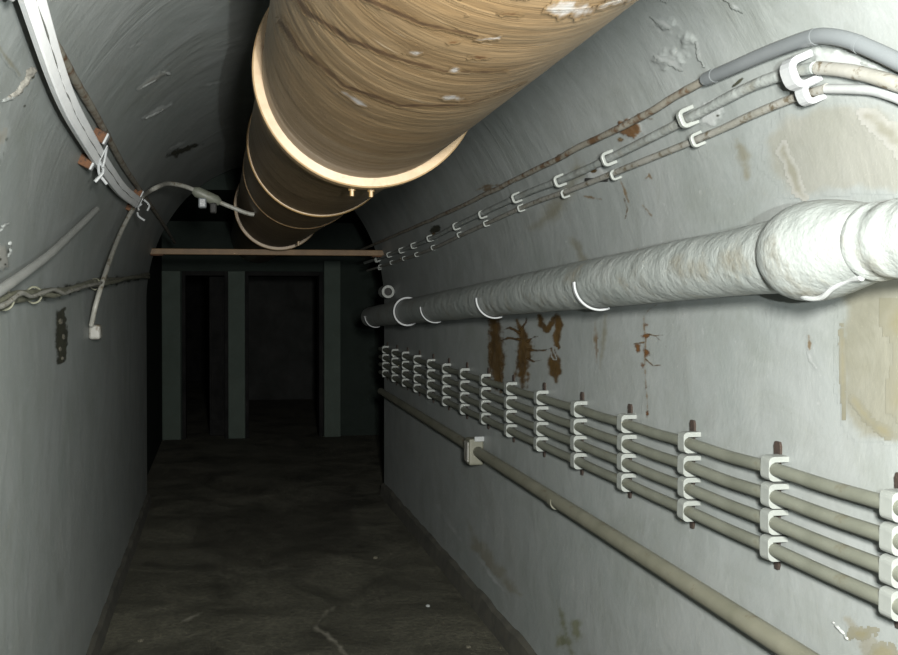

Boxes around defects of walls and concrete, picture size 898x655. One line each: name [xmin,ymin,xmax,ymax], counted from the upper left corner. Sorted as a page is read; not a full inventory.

spalling [56,307,68,364]
corrosion [485,312,566,394]
water stain [834,279,898,445]